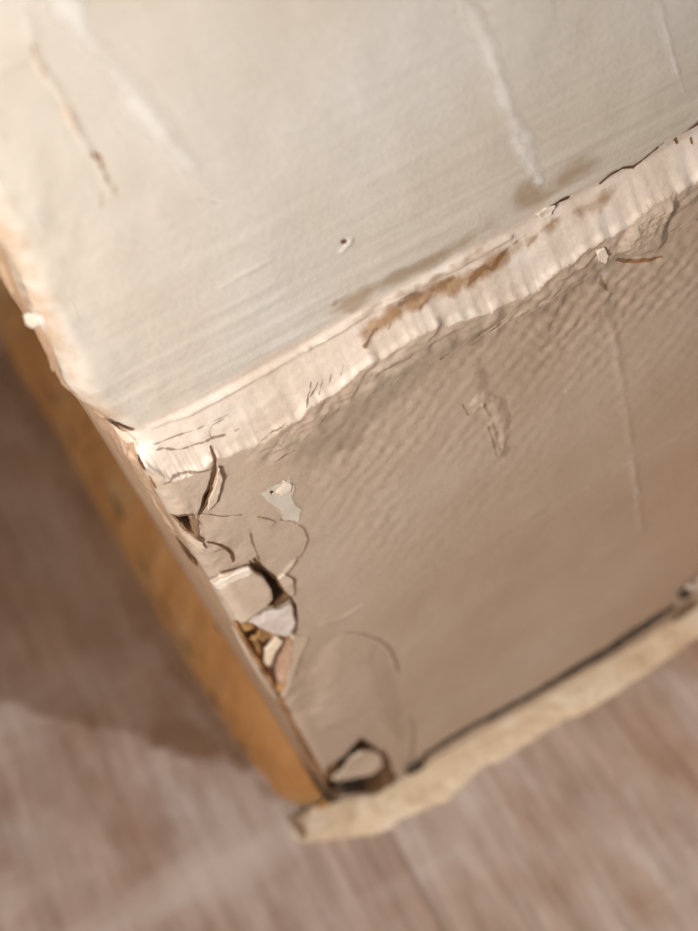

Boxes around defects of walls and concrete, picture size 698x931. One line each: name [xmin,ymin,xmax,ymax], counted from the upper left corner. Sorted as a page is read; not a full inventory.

peeling [595,191,678,264]
crack [107,417,309,574]
spalling [209,558,309,699]
spalling [319,738,397,797]